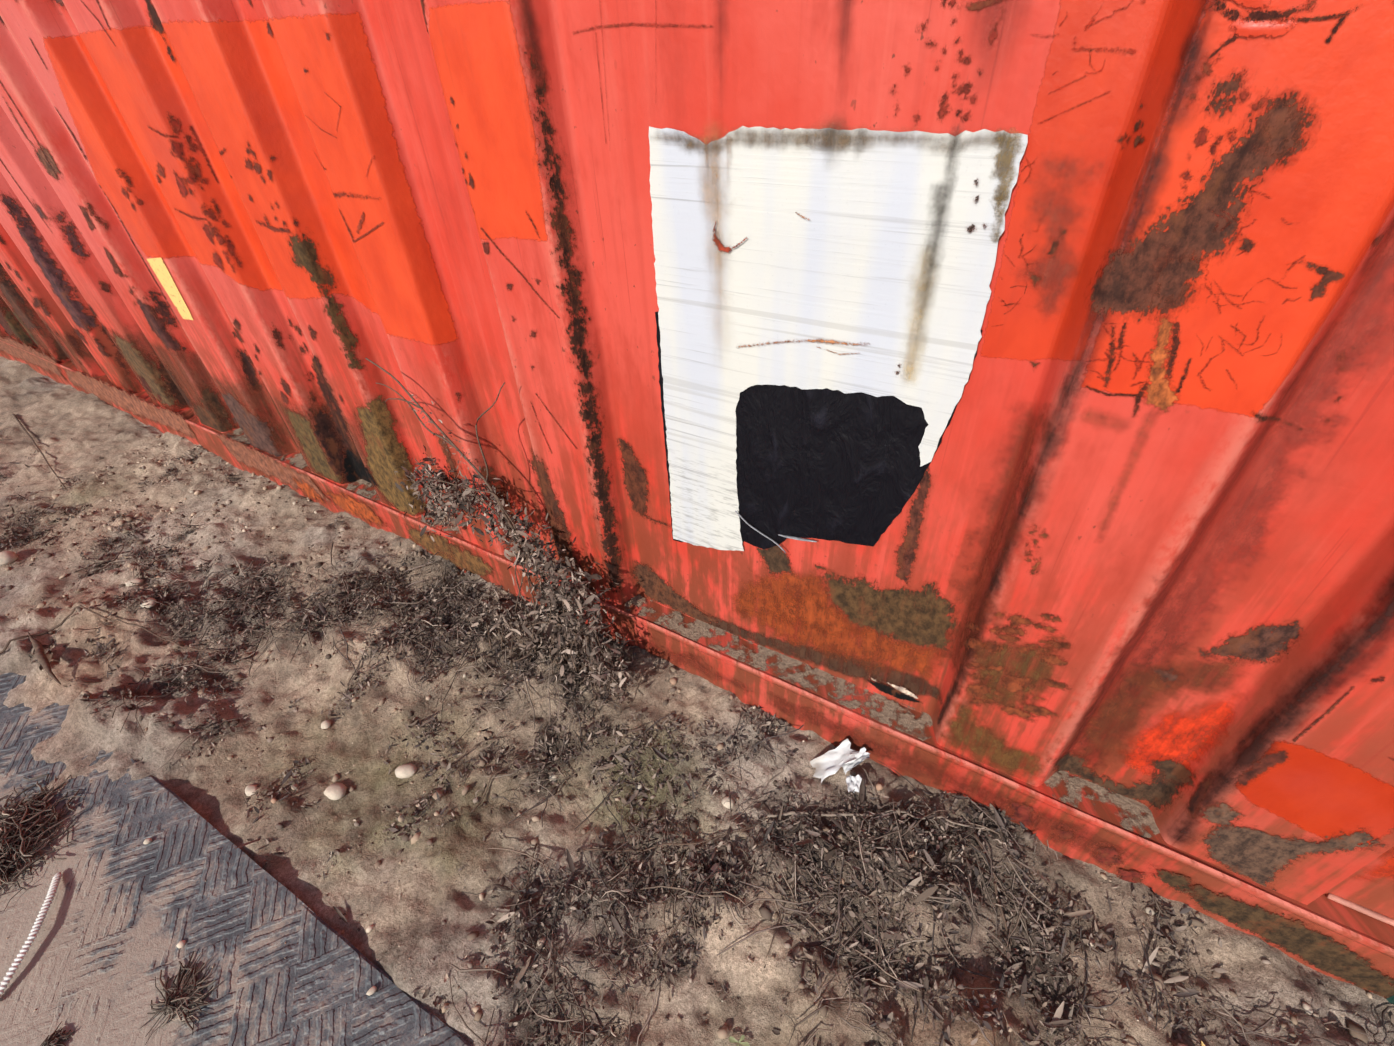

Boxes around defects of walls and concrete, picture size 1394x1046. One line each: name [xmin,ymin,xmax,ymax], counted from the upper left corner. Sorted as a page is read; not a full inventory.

corrosion [0,195,494,577]
corrosion [522,0,717,623]
peeling [871,678,918,699]
corrosion [739,361,1084,724]
corrosion [775,697,1394,999]
corrosion [1172,36,1200,111]
corrosion [1090,73,1316,330]
corrosion [1055,577,1394,891]